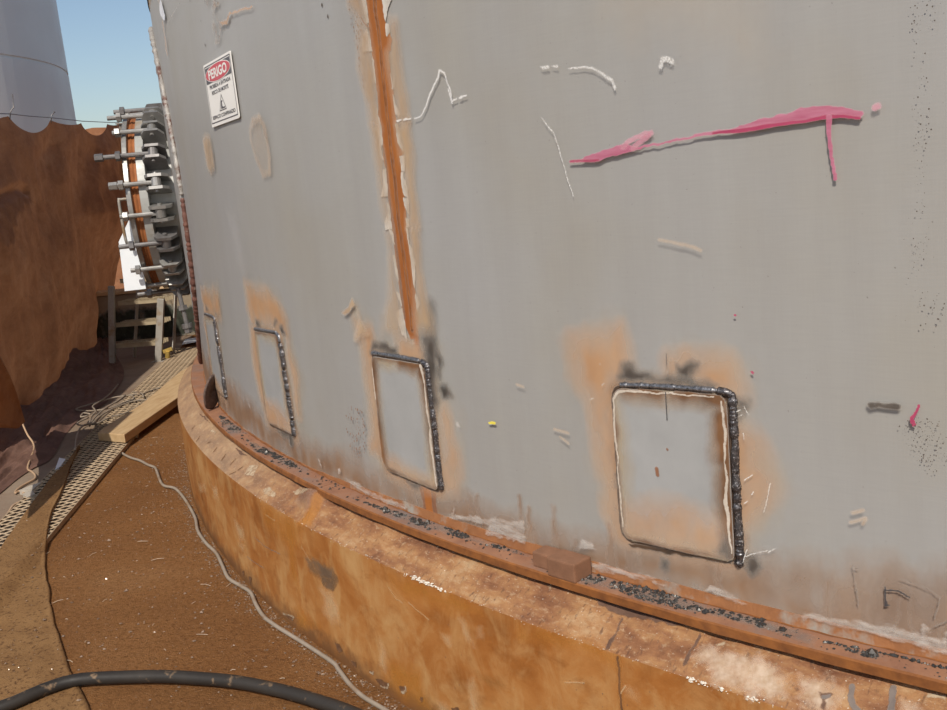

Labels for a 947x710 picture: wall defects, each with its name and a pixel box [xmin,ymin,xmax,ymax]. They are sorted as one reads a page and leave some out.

peeling [361,0,376,83]
peeling [382,0,391,36]
peeling [376,108,399,280]
rust [349,0,429,348]
peeling [391,78,420,309]
peeling [396,292,407,340]